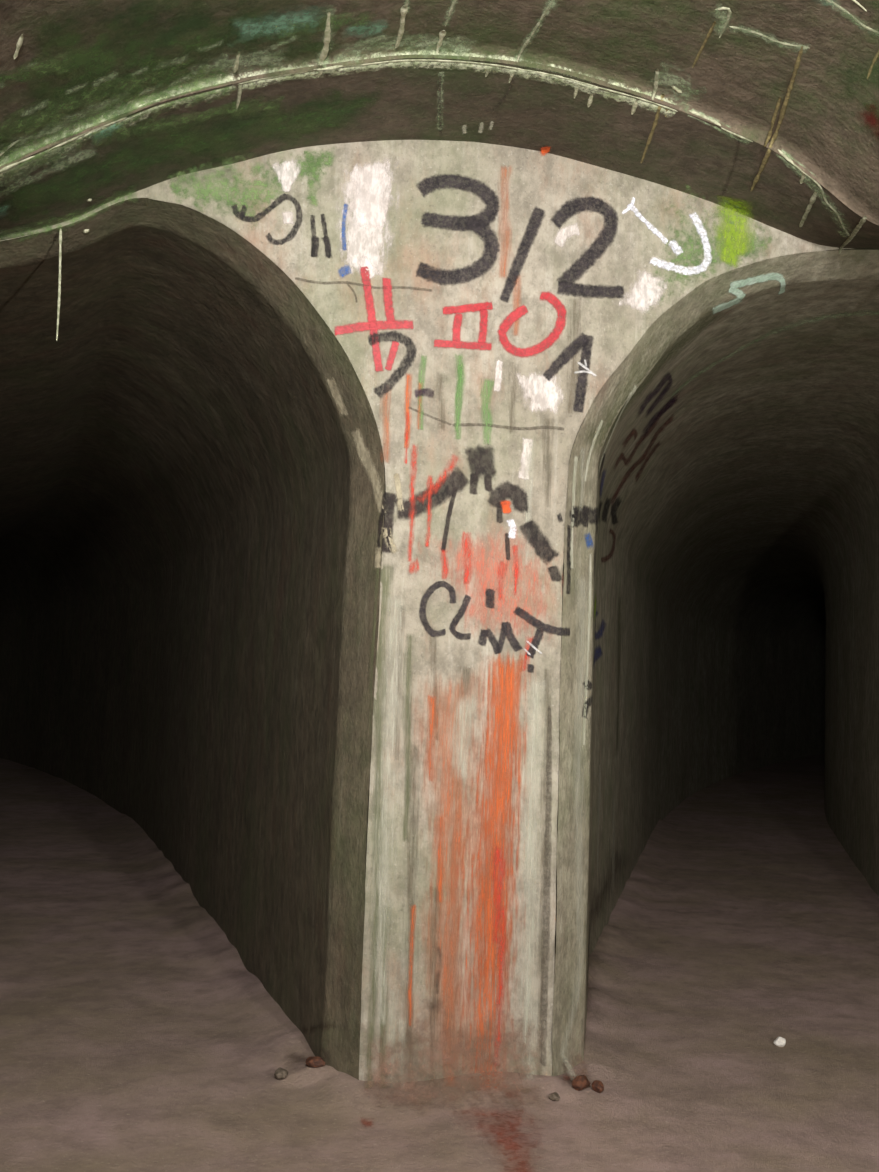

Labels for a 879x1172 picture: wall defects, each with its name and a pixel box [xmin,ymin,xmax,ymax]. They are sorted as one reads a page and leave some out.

corrosion [429,658,526,1096]